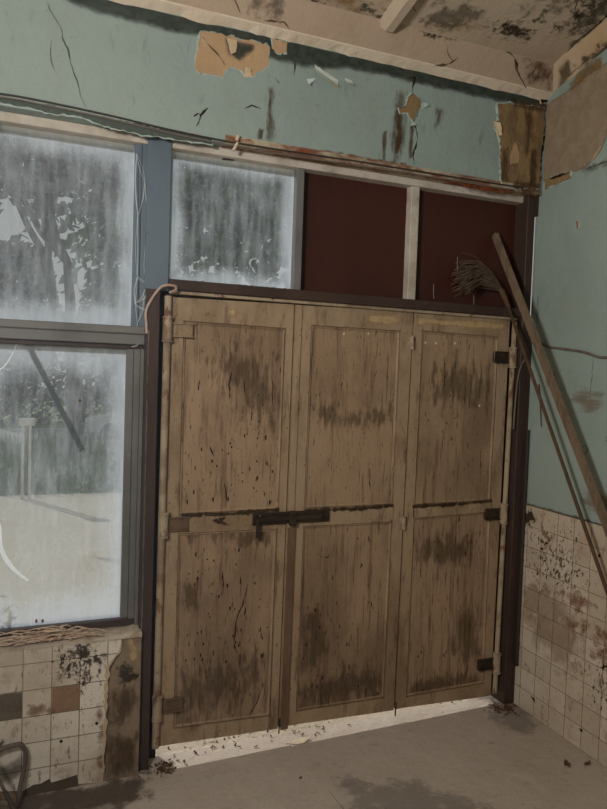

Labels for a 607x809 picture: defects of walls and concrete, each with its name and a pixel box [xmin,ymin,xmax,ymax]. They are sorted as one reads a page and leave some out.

damp [493,0,607,42]
crack [46,1,86,107]
peeling [194,30,287,80]
damp [70,0,541,105]
damp [572,43,606,87]
flaking render [397,92,429,126]
flaking render [493,63,607,191]